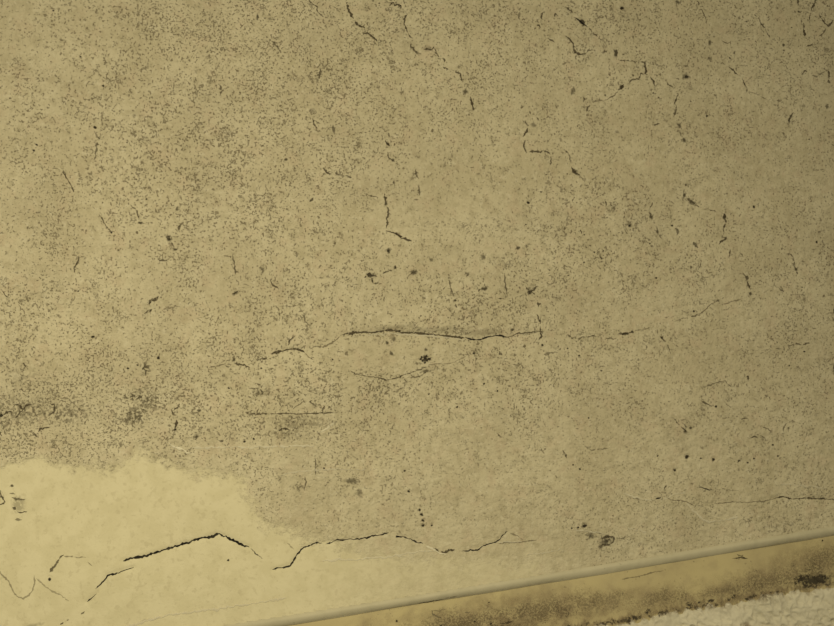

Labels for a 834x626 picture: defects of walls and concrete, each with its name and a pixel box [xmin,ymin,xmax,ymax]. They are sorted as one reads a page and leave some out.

crack [212,302,543,380]
crack [81,533,258,614]
crack [272,531,535,570]
damp [794,575,830,588]